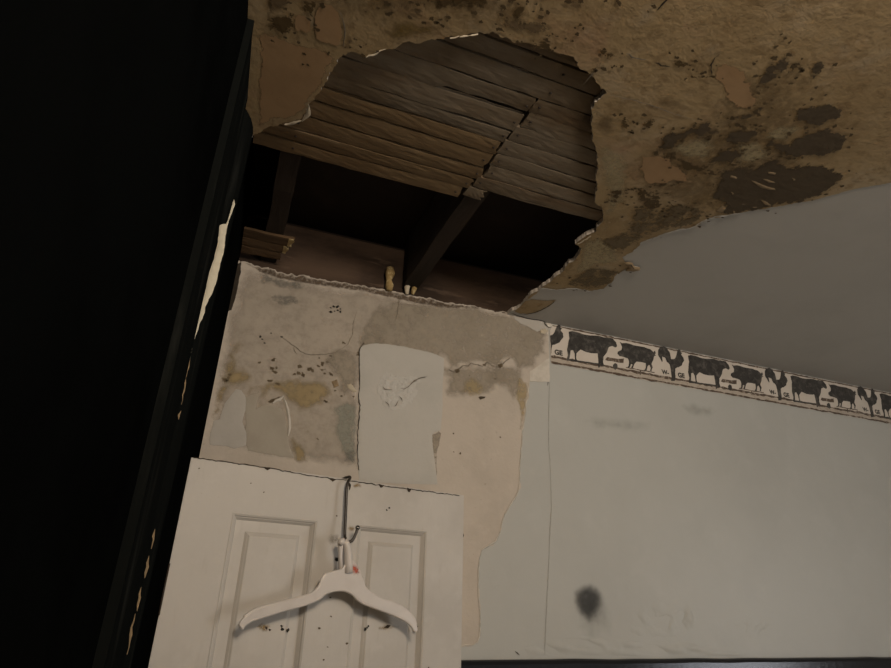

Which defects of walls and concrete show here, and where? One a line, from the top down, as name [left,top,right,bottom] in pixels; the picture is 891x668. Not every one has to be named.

peeling [195,0,891,647]